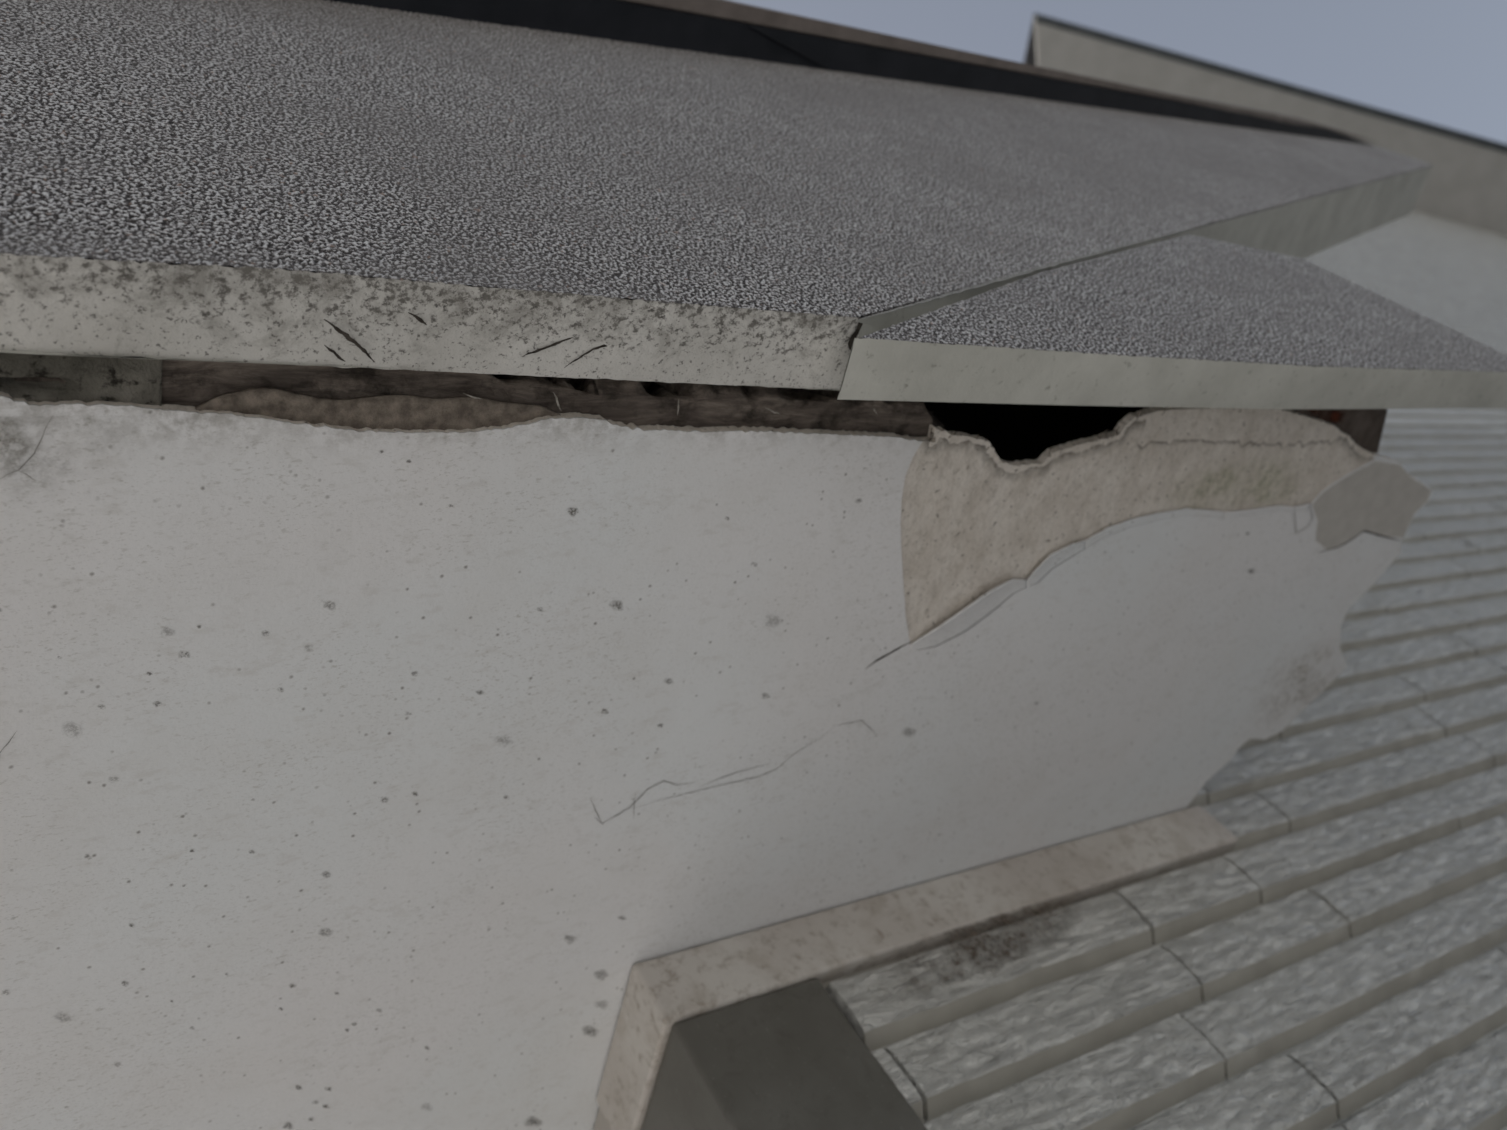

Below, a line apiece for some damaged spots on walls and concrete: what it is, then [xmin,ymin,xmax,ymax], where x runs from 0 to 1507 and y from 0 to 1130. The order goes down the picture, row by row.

spalling [324,319,375,362]
spalling [522,337,574,357]
peeling [901,407,1431,651]
crack [591,720,877,825]